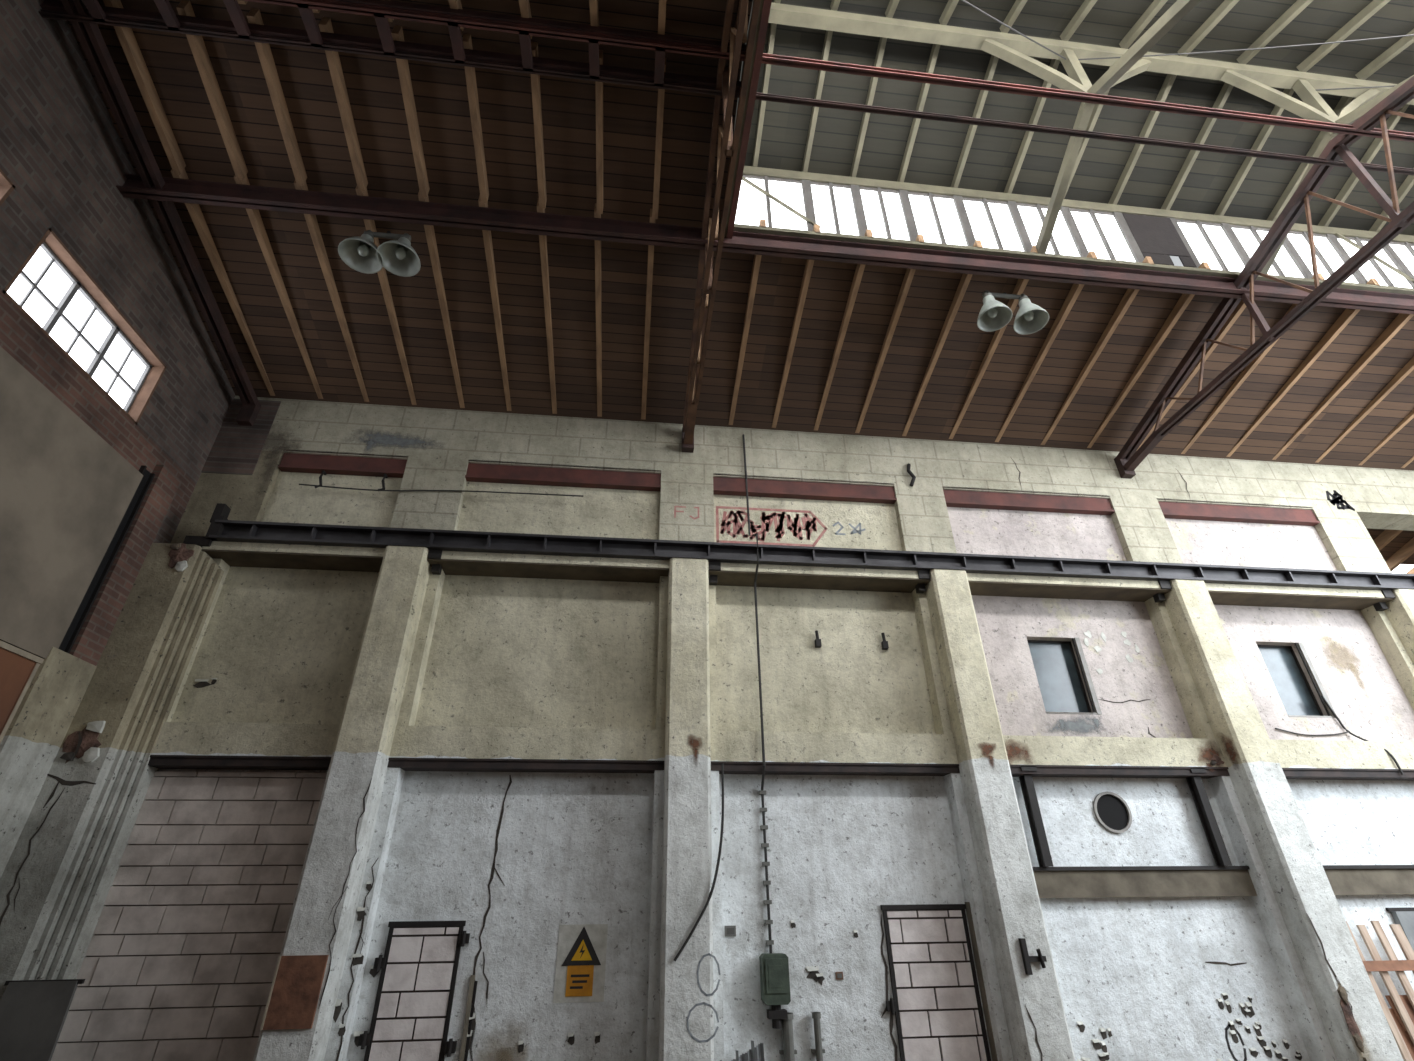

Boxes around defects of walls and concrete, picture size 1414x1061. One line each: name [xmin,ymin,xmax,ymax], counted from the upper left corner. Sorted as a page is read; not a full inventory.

rust [688,736,700,760]
rust [979,743,1031,766]
crack [470,775,512,1060]
peeling [1216,993,1302,1061]